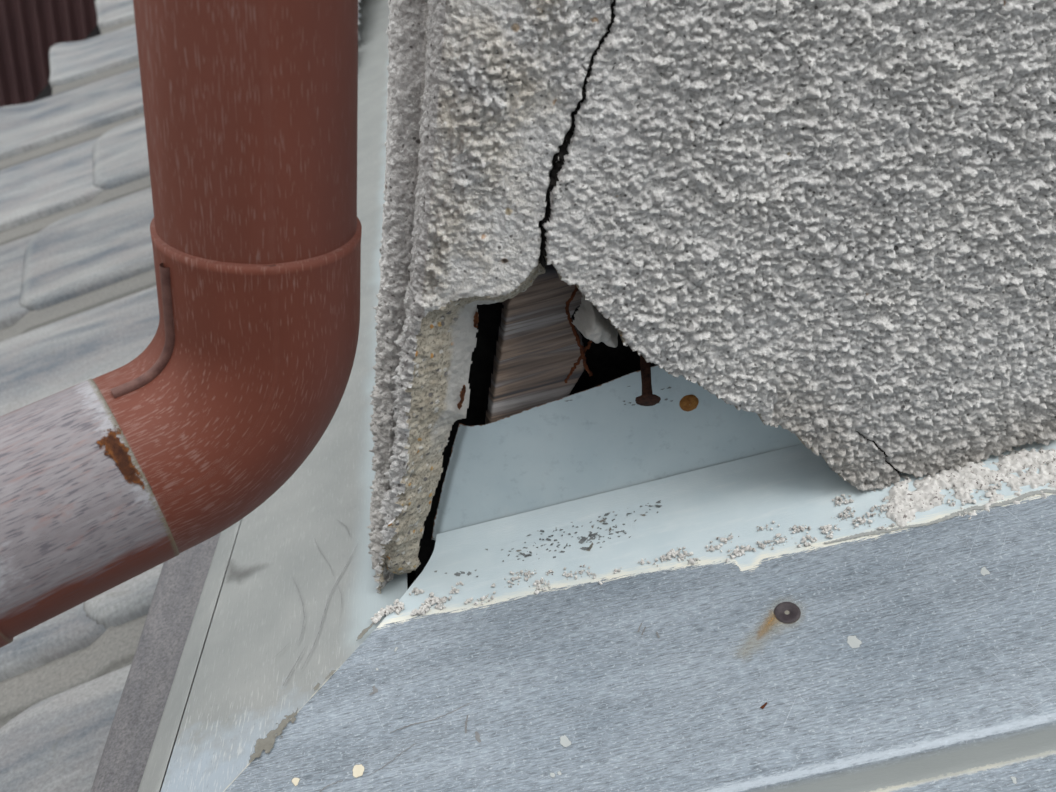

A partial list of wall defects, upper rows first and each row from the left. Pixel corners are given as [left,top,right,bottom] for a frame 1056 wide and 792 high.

crack [538,0,616,267]
corrosion [96,425,145,490]
spalling [373,256,860,594]